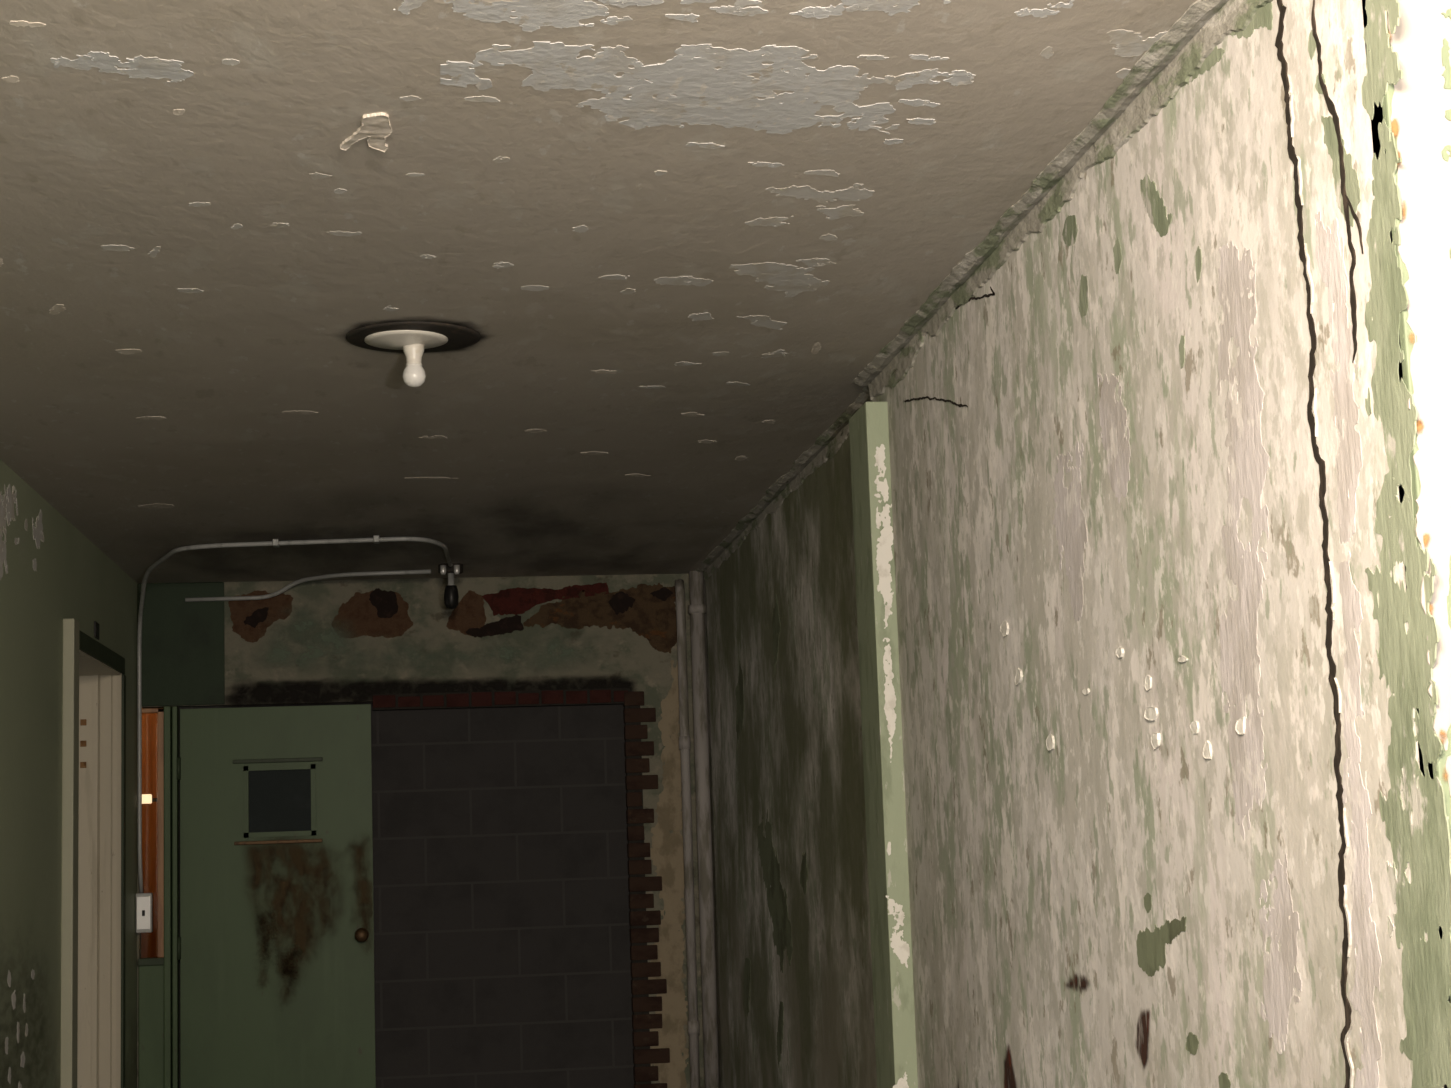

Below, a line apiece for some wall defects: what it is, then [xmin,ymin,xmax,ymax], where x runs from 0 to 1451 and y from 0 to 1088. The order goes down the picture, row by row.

peeling [1014,0,1074,18]
peeling [393,0,976,149]
peeling [340,112,392,152]
peeling [0,484,44,580]
crack [1275,0,1364,1088]
peeling [1315,0,1451,1088]
flaking render [228,590,294,643]
flaking render [331,588,413,639]
peeling [874,444,896,763]
peeling [885,895,910,968]
peeling [5,969,35,1088]
peeling [892,1072,909,1088]